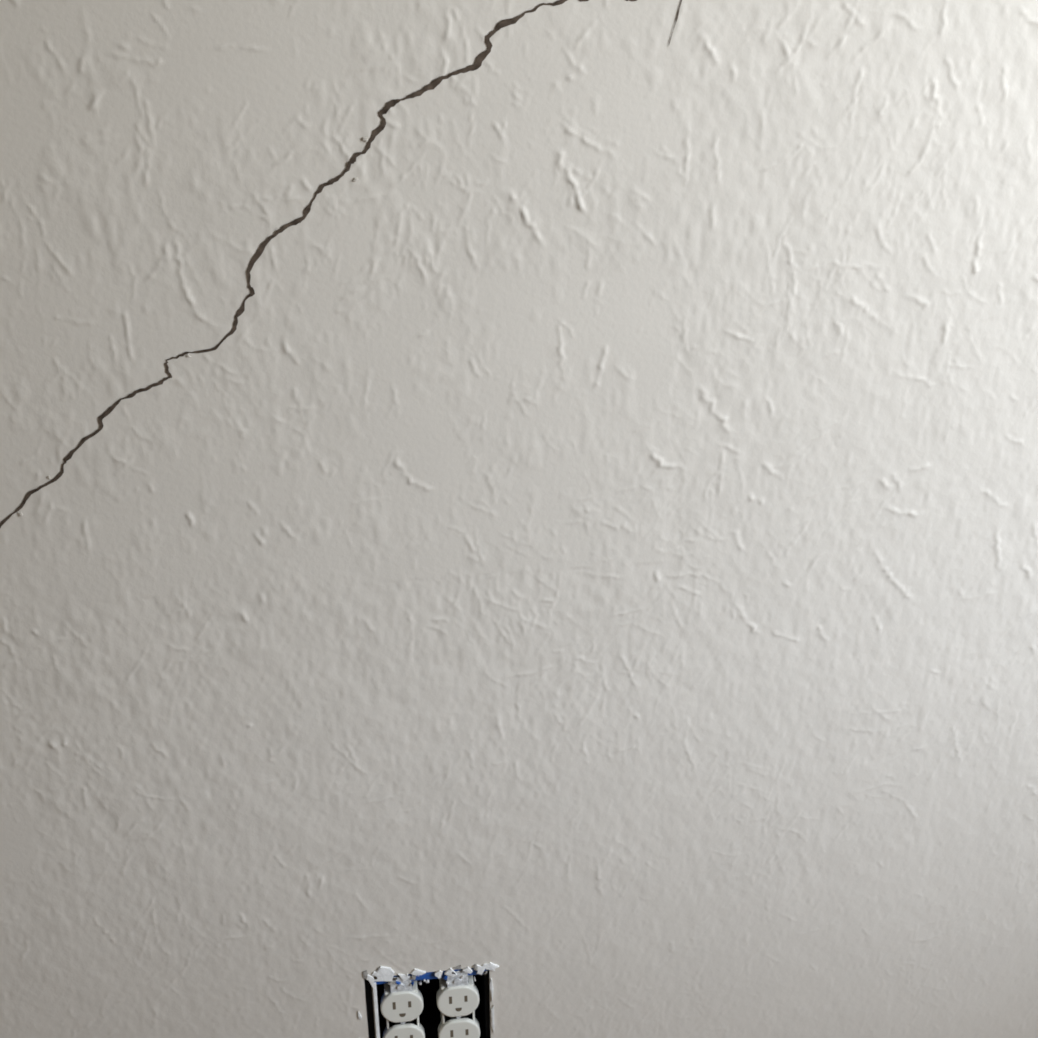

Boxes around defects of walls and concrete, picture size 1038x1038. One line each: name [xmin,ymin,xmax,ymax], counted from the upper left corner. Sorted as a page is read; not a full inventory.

crack [0,0,589,528]